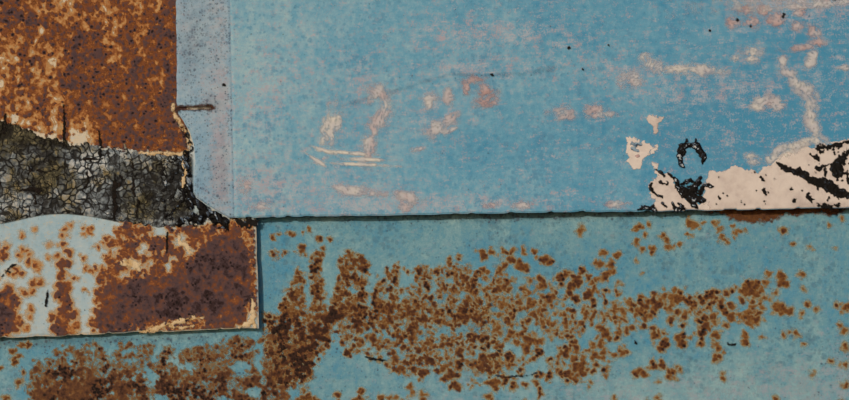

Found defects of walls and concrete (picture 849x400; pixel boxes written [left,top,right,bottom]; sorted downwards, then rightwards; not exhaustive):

corrosion [0,0,215,156]
peeling [647,114,664,134]
crack [0,104,193,252]
peeling [626,137,849,213]
corrosion [631,208,845,275]
corrosion [0,219,821,400]
corrosion [827,301,849,369]